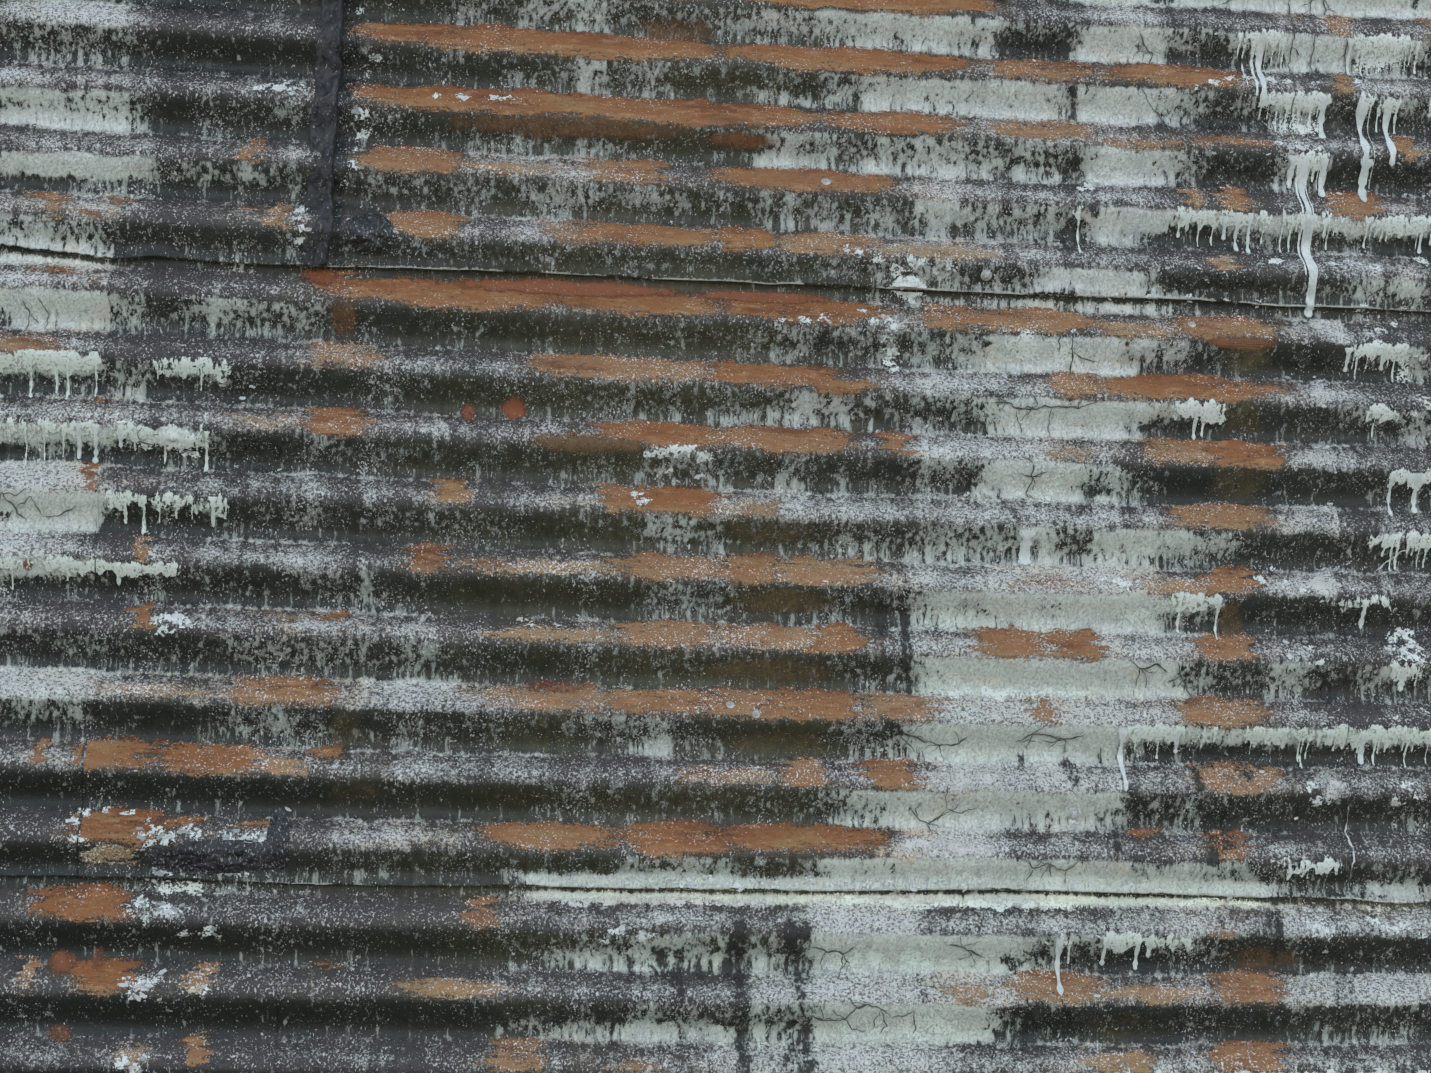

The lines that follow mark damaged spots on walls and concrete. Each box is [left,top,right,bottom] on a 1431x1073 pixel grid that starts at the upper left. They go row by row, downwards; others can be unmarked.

rust [345,19,1258,91]
rust [340,80,1283,199]
rust [297,263,1287,350]
rust [502,398,919,461]
rust [1039,369,1302,475]
crack [0,488,75,523]
rust [399,538,894,593]
rust [437,616,871,658]
rust [446,679,952,730]
rust [23,731,346,783]
rust [12,804,270,925]
rust [932,966,1294,1011]